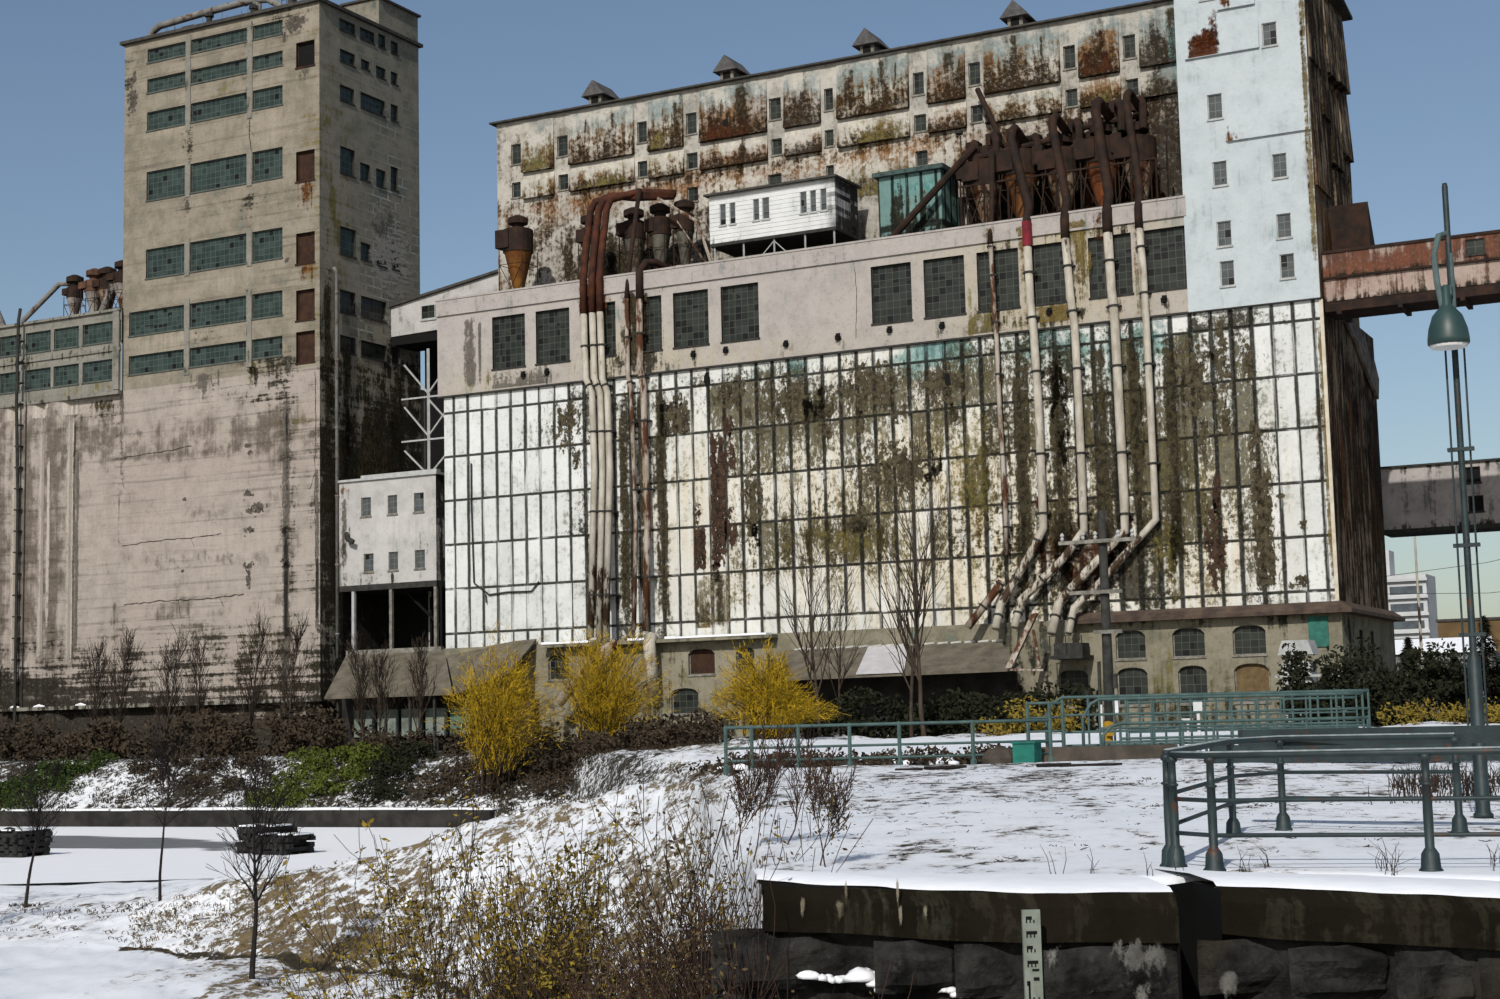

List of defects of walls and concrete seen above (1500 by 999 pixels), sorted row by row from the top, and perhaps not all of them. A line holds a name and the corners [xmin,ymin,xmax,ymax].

rust [702,113,751,141]
rust [1188,0,1230,58]
leakage [7,396,124,669]
leakage [249,362,290,687]
leakage [315,280,410,631]
leakage [618,383,670,616]